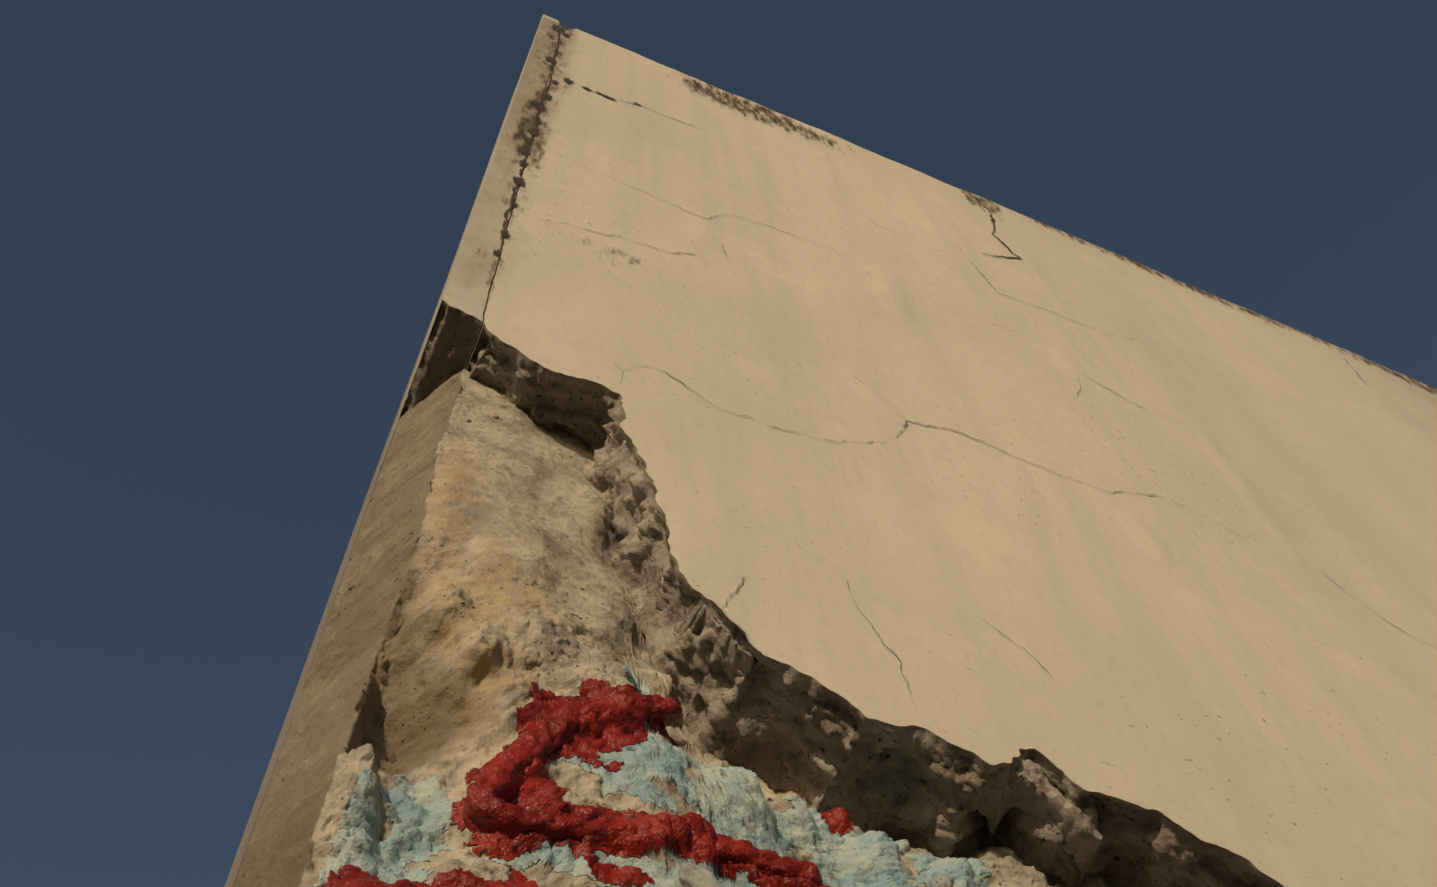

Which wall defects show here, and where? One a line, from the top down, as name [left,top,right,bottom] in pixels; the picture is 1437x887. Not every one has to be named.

mould [513,25,570,167]
crack [493,24,810,259]
mould [683,78,833,146]
crack [870,198,1091,334]
crack [618,365,1161,497]
spalling [232,300,1284,887]